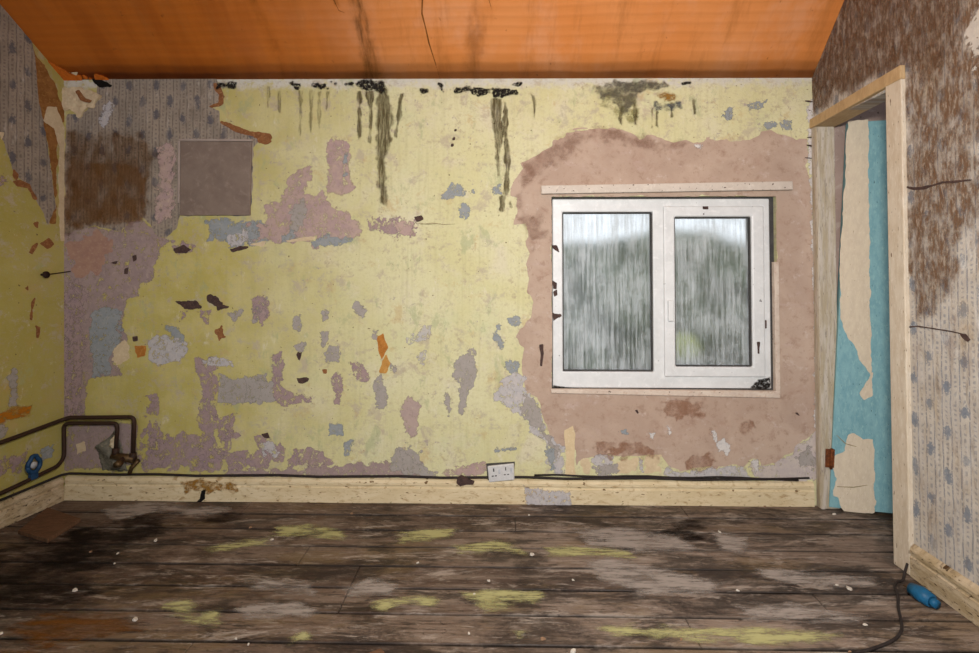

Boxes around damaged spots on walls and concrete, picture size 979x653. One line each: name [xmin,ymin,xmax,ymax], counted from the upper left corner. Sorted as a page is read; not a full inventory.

crack [421,0,440,78]
water stain [420,82,522,211]
water stain [596,80,681,126]
water stain [812,0,979,313]
peeling [29,51,487,502]
flaking render [492,99,816,481]
corrosion [0,405,32,423]
peeling [833,433,876,513]